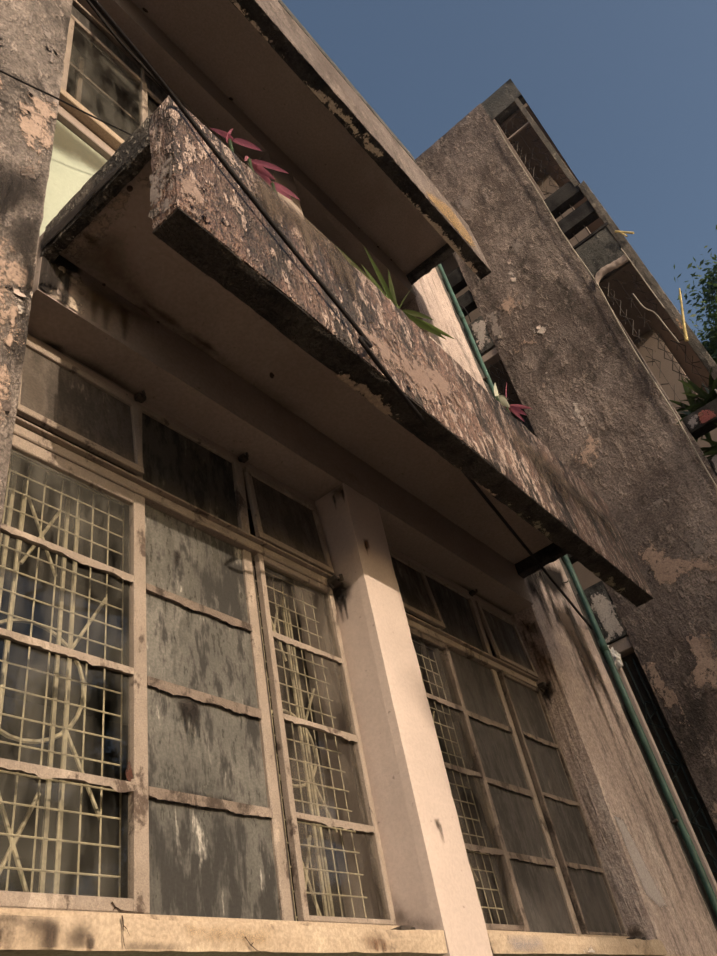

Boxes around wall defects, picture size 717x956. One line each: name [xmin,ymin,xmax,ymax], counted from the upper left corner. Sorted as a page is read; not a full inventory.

peeling [16,92,58,180]
spalling [335,371,402,421]
peeling [354,321,463,411]
peeling [638,543,717,586]
peeling [590,593,623,643]
leakage [526,567,615,734]
peeling [686,631,717,691]
peeling [642,662,690,726]